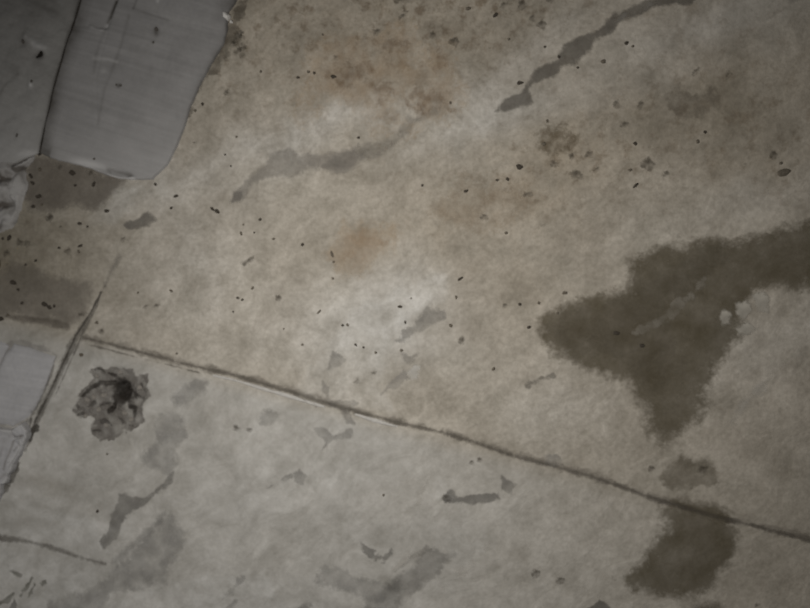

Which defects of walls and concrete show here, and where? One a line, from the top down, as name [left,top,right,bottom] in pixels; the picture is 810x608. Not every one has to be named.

peeling [0,156,35,233]
leakage [542,225,810,430]
crack [29,292,102,441]
spalling [73,367,148,441]
crack [213,375,325,408]
crack [355,413,398,427]
leakage [629,507,733,595]